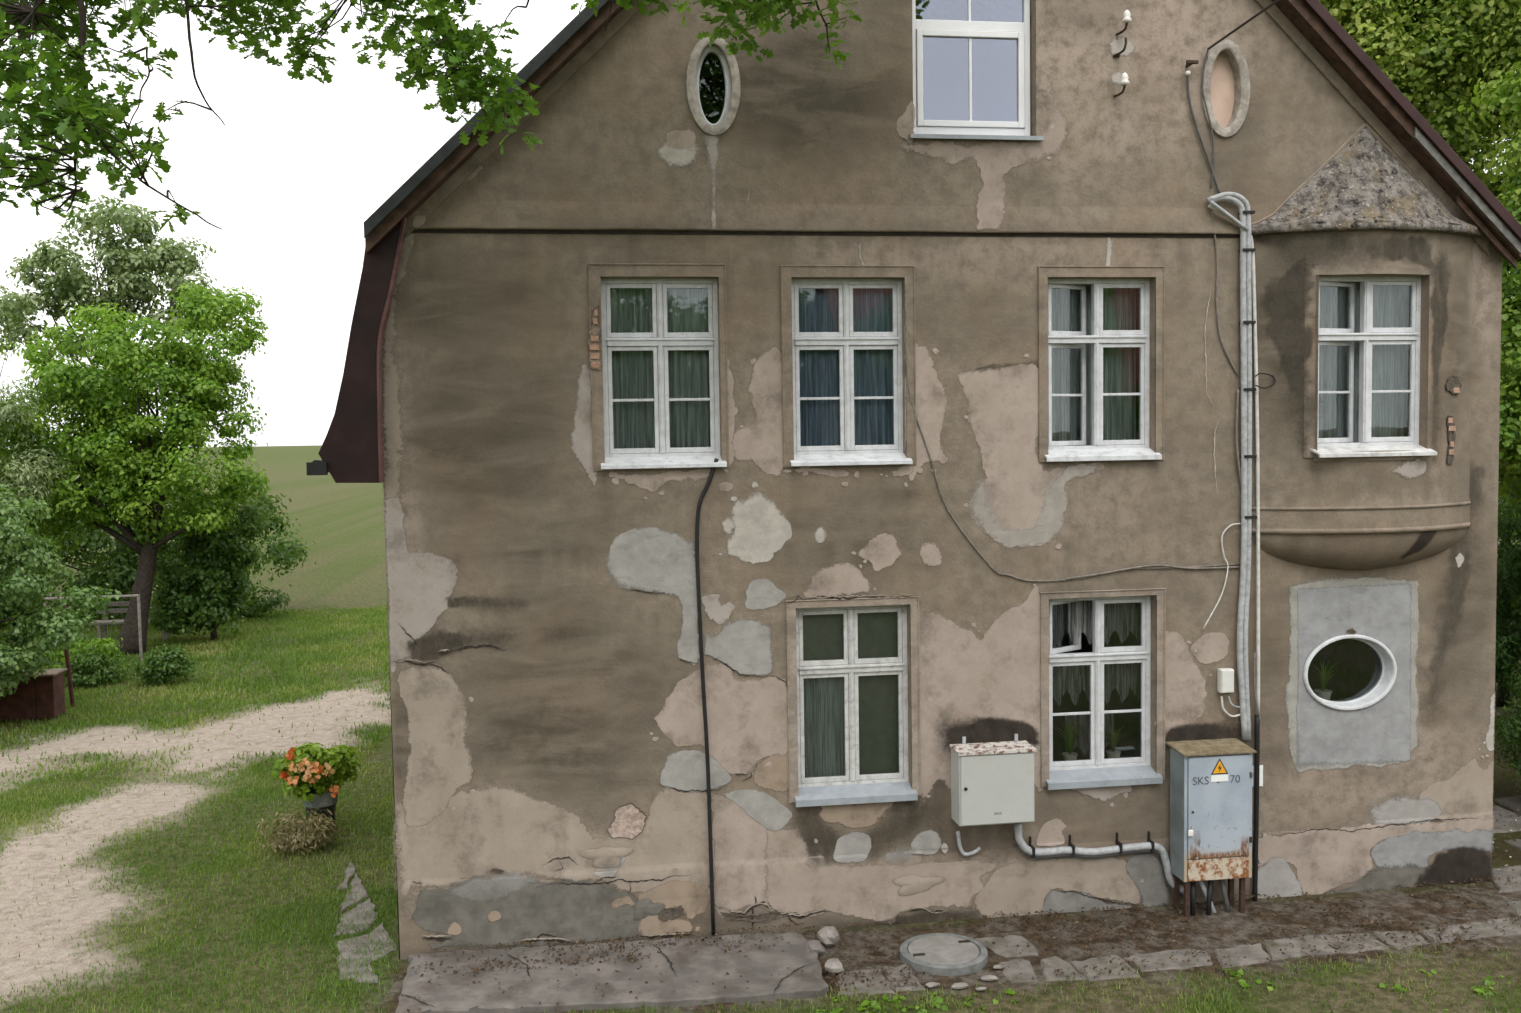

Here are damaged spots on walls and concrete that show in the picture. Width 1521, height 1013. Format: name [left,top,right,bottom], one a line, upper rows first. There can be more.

peeling [896,67,1067,230]
peeling [608,346,859,502]
peeling [880,326,1068,549]
peeling [394,663,1144,939]
peeling [1252,694,1495,895]
water stain [1415,847,1492,887]